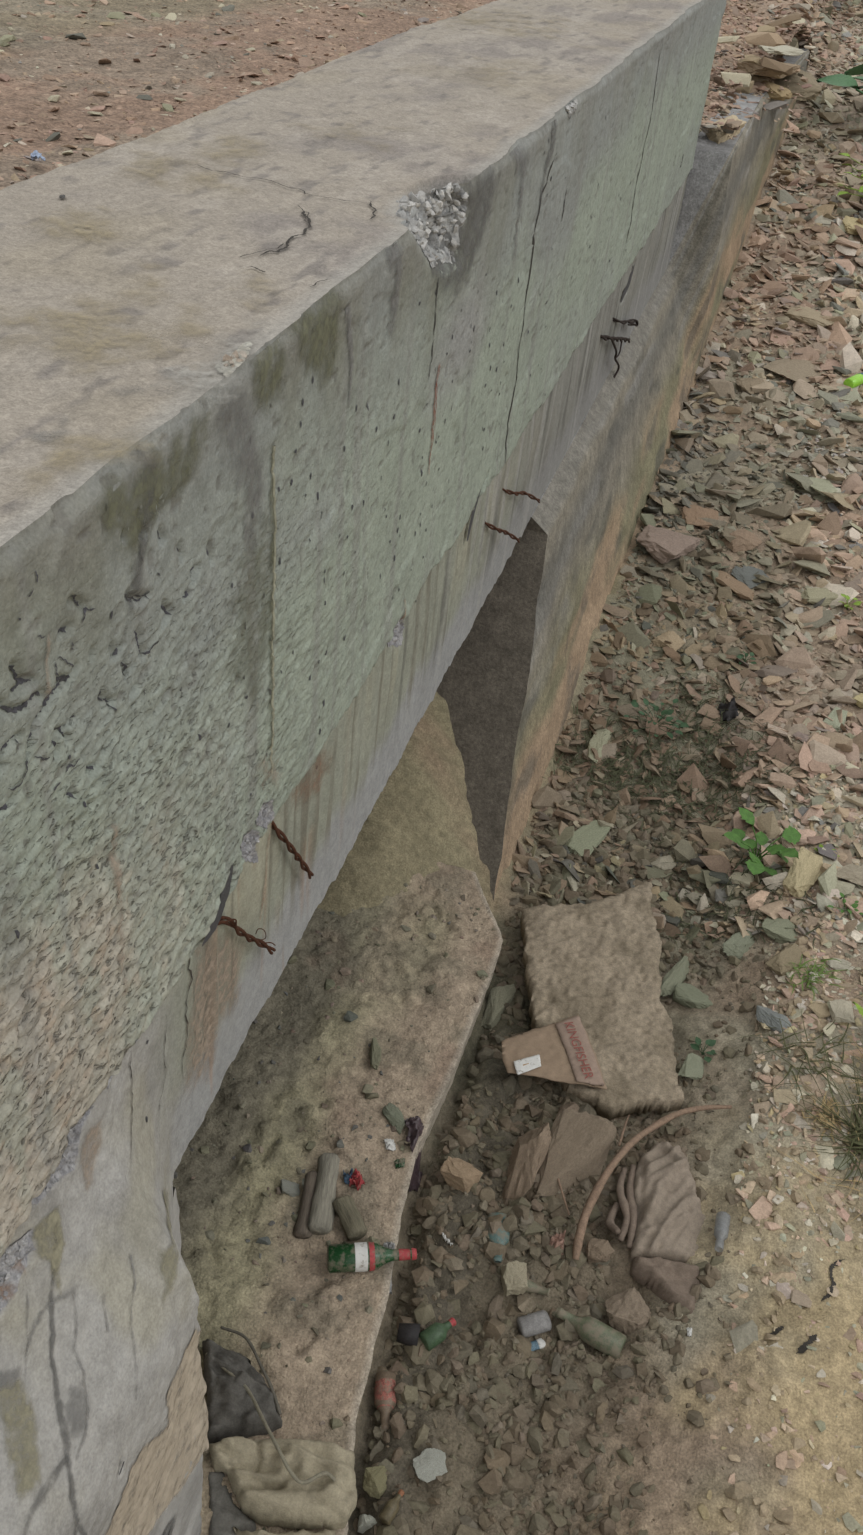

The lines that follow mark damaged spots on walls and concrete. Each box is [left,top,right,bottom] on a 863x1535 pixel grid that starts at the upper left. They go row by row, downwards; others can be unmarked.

crack [201,166,377,272]
crack [505,155,567,463]